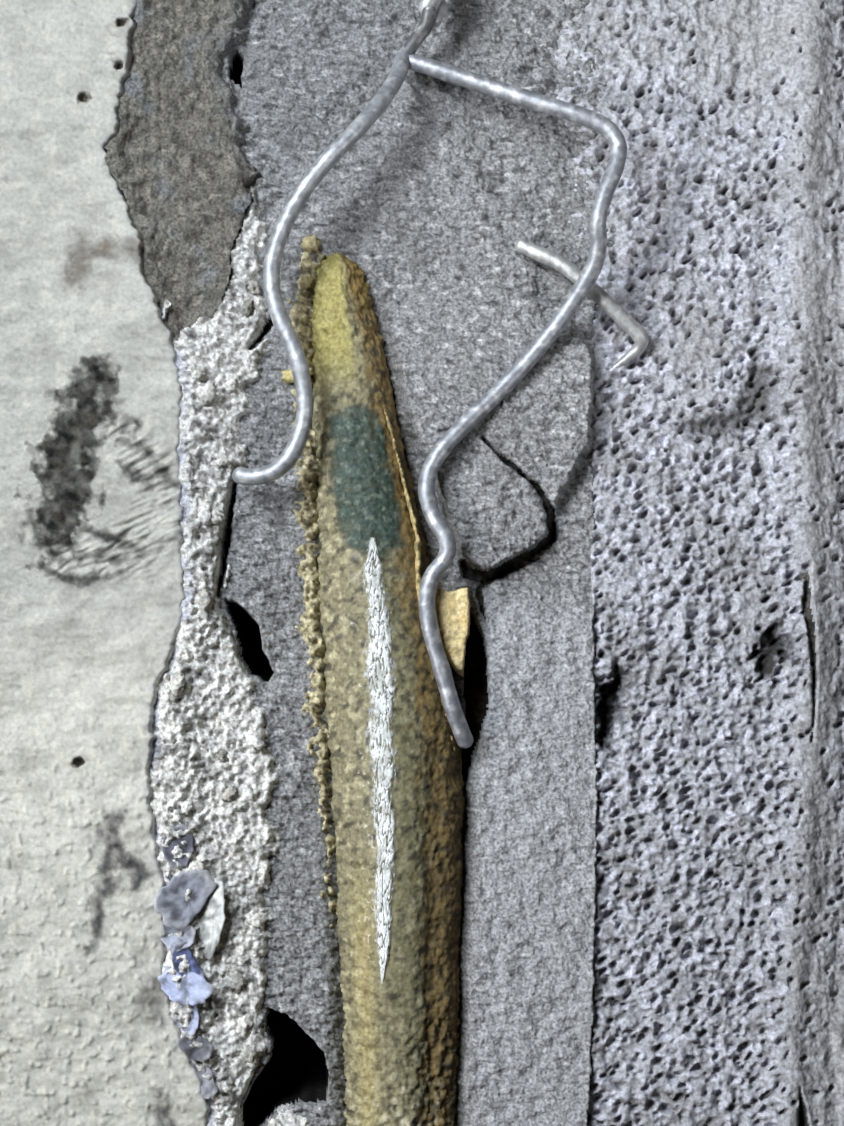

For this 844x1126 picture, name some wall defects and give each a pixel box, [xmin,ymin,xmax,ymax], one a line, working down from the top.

crack [250,318,273,348]
damp [32,356,140,584]
spalling [104,0,330,1126]
peeling [435,587,470,677]
crack [461,437,556,620]
crack [798,1093,809,1126]